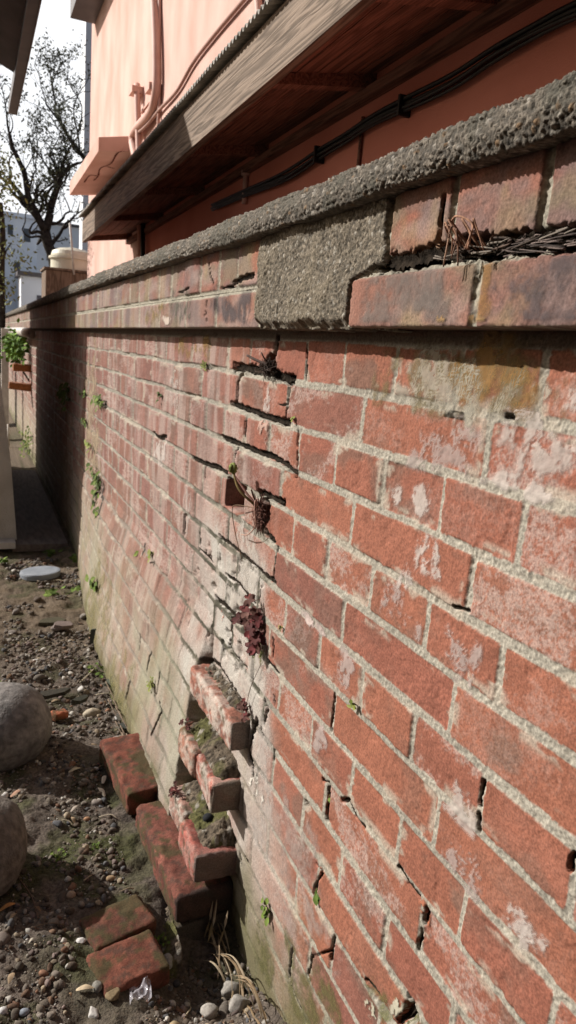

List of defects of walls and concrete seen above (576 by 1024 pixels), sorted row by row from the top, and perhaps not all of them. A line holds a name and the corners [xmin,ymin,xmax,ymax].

crack [194,338,300,478]
leakage [383,350,486,468]
leakage [491,343,576,504]
crack [262,491,286,504]
leakage [393,485,427,516]
leakage [381,536,441,605]
spalling [205,663,245,714]
spalling [190,717,264,803]
spalling [182,780,236,849]
crack [400,865,421,896]
leakage [284,931,340,1024]
crack [291,937,336,973]